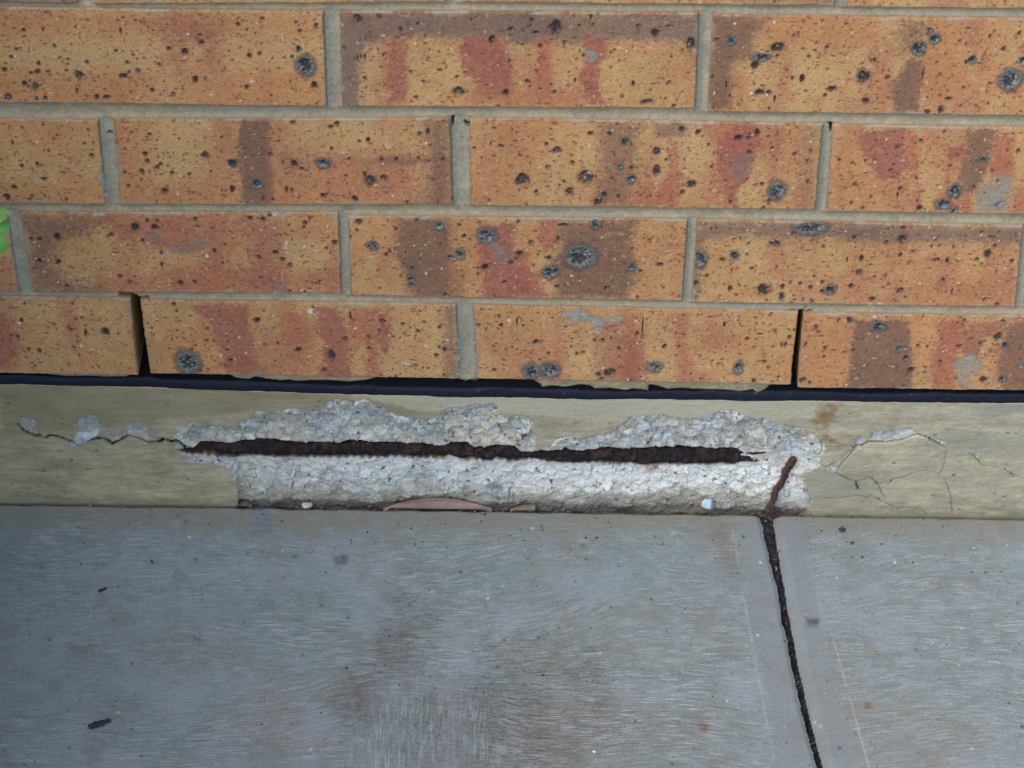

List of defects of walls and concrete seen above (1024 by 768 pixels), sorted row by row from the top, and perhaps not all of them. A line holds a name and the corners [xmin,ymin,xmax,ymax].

spalling [173,399,827,519]
crack [825,427,1023,513]